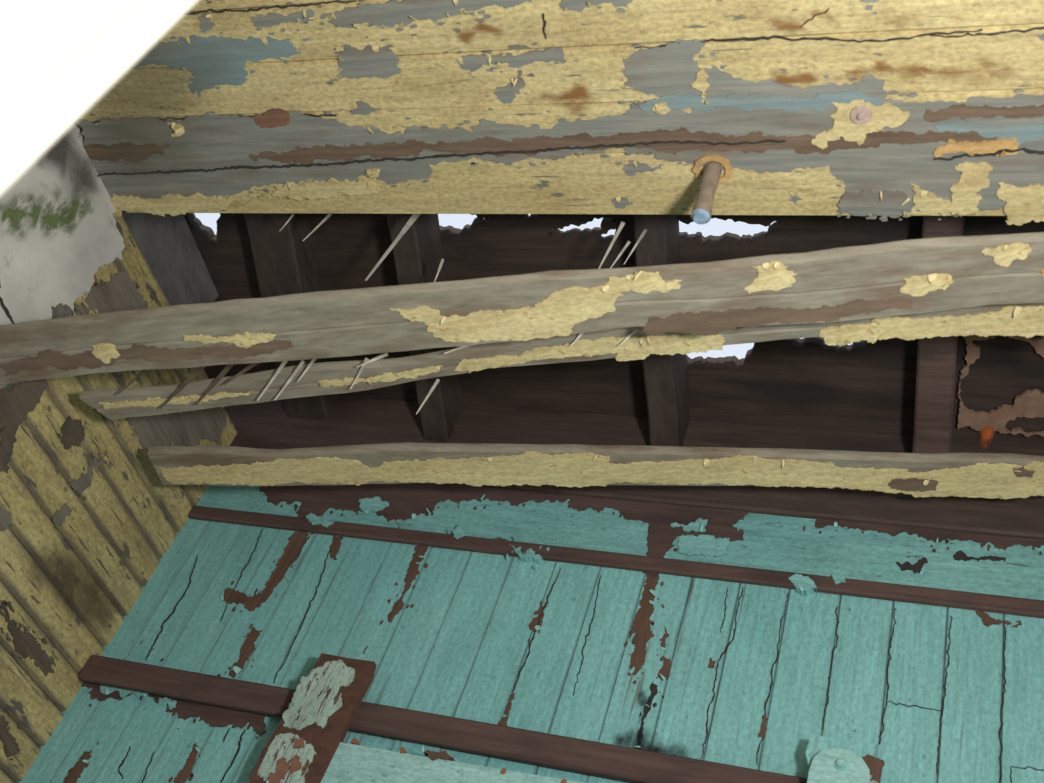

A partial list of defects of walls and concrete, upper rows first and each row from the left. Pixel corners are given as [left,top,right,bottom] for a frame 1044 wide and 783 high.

peeling [124,0,532,97]
peeling [76,39,1044,226]
water stain [43,137,93,220]
peeling [51,258,148,319]
peeling [125,396,227,451]
corrosion [982,427,993,441]
peeling [380,544,428,625]
peeling [220,481,749,612]
peeling [803,518,1044,575]
peeling [217,624,262,678]
peeling [624,571,672,749]
peeling [81,659,355,783]